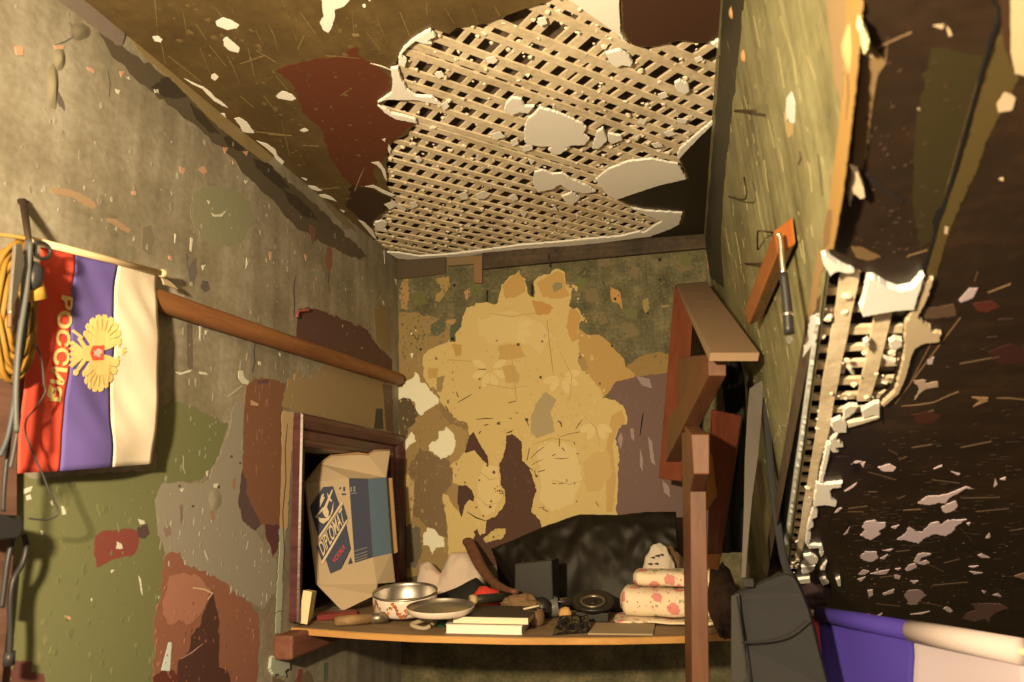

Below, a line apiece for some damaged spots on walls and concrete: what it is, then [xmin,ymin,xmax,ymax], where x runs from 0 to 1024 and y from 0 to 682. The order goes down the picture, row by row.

peeling [276,0,717,249]
peeling [763,0,941,578]
peeling [94,519,145,573]
peeling [153,552,290,682]
peeling [238,307,469,633]
peeling [843,465,971,615]